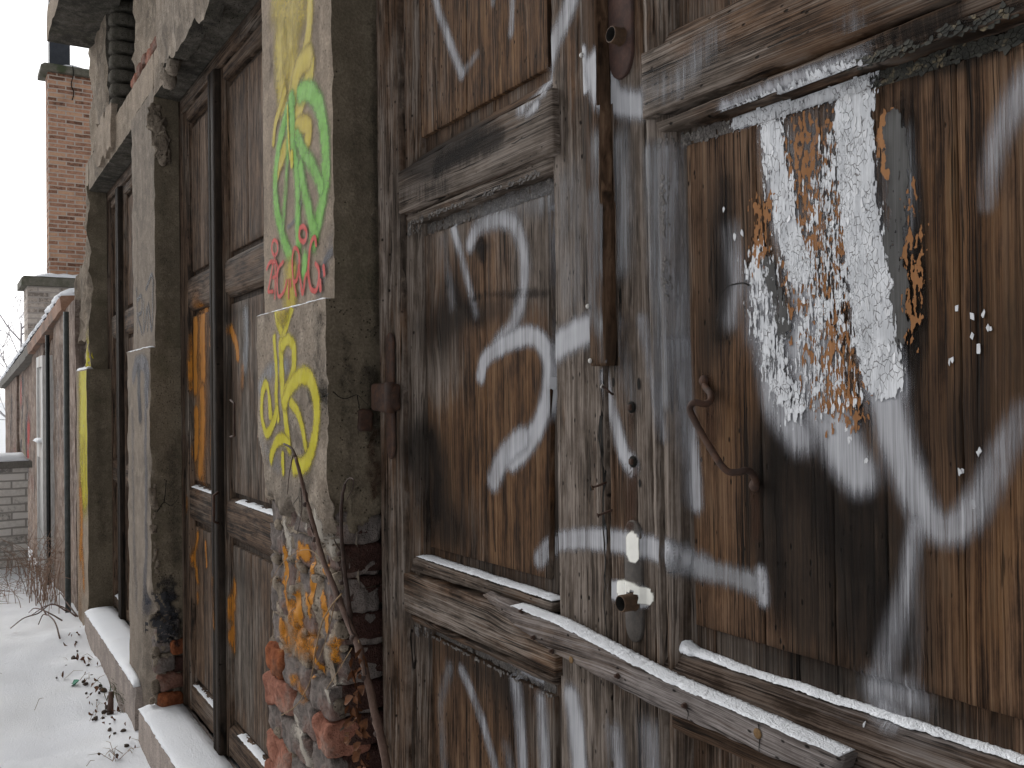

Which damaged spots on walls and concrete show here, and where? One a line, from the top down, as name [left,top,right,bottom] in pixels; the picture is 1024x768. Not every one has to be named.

peeling [656,0,1024,444]
flaking render [263,488,384,768]